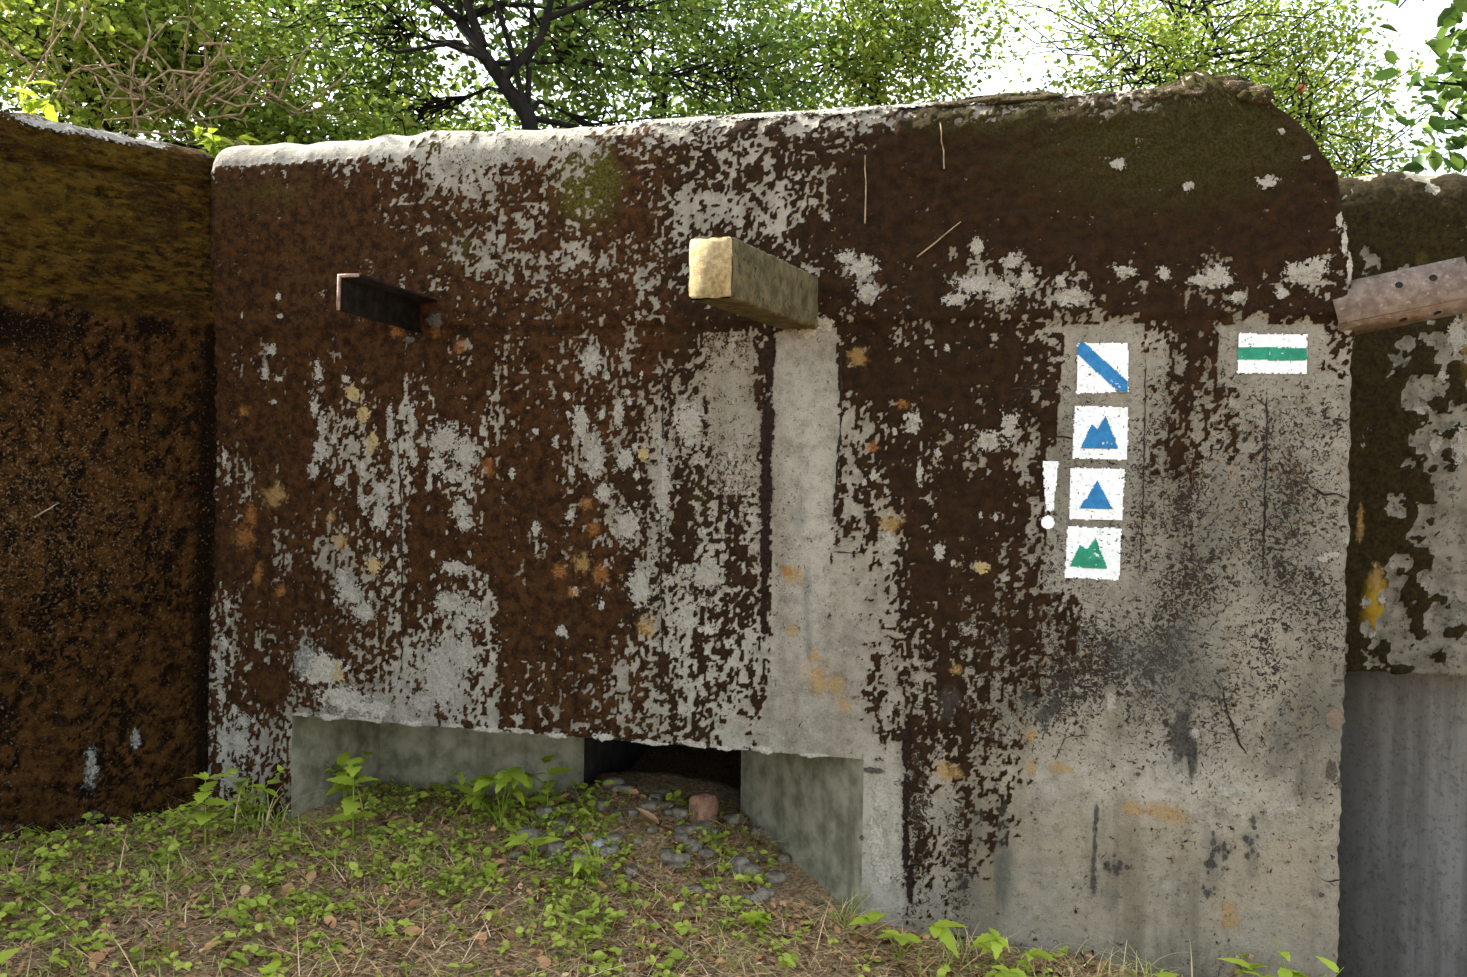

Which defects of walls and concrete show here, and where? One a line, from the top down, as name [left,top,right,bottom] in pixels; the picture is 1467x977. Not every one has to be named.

peeling [636,100,945,127]
peeling [834,248,882,305]
peeling [940,236,1036,306]
peeling [1051,275,1090,308]
peeling [1113,258,1248,305]
peeling [1273,212,1353,299]
peeling [964,406,1021,453]
peeling [307,358,489,624]
peeling [531,341,746,620]
spalling [292,550,569,739]
peeling [215,581,262,808]
spalling [592,733,779,755]